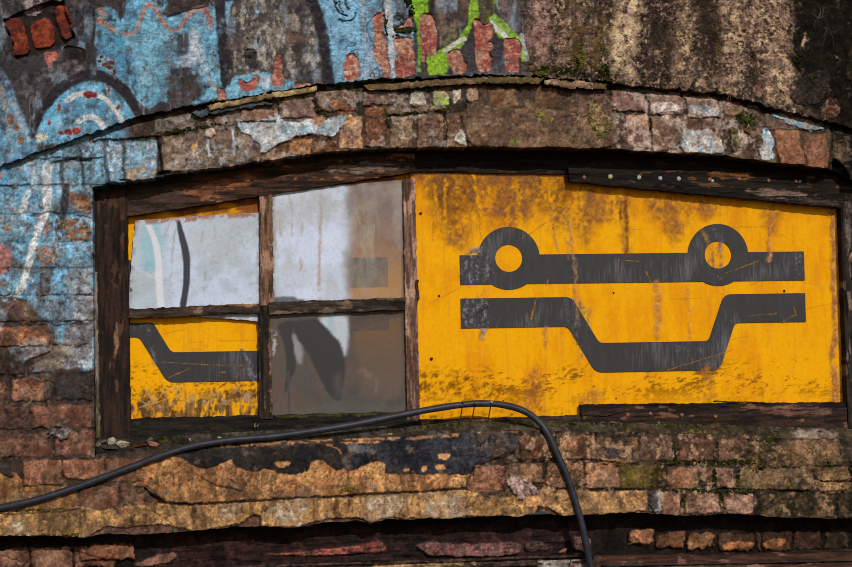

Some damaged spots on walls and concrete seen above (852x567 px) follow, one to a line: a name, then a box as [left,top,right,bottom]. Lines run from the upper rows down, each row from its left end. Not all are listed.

flaking render [3,0,86,68]
flaking render [343,53,361,81]
flaking render [372,11,438,78]
flaking render [447,19,522,75]
water stain [525,0,551,64]
water stain [563,0,641,79]
water stain [649,0,852,119]
peeling [58,127,81,136]
peeling [235,100,355,161]
spalling [95,437,160,450]
peeling [173,431,520,493]
flaking render [89,525,172,536]